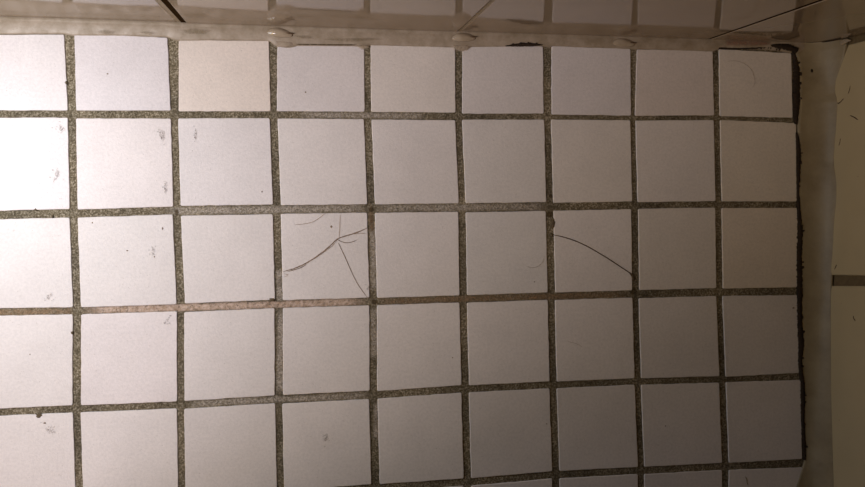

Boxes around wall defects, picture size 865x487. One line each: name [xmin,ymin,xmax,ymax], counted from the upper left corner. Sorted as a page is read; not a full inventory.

crack [284,214,368,297]
crack [555,235,633,275]